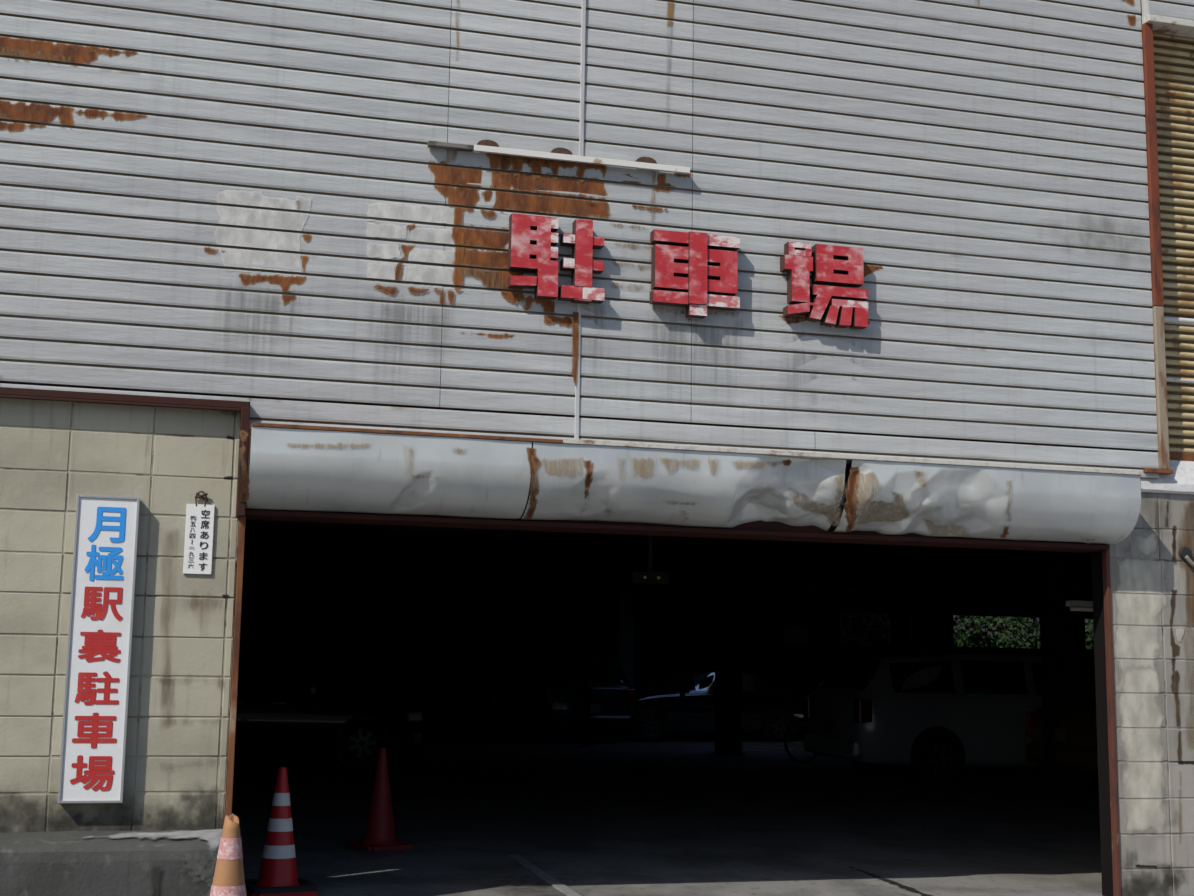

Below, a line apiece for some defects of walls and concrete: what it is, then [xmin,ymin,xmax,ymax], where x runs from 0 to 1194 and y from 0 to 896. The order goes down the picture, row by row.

rust [0,36,137,67]
rust [0,99,147,132]
rust [428,150,691,386]
rust [524,448,541,520]
rust [584,460,593,499]
leakage [1179,501,1194,627]